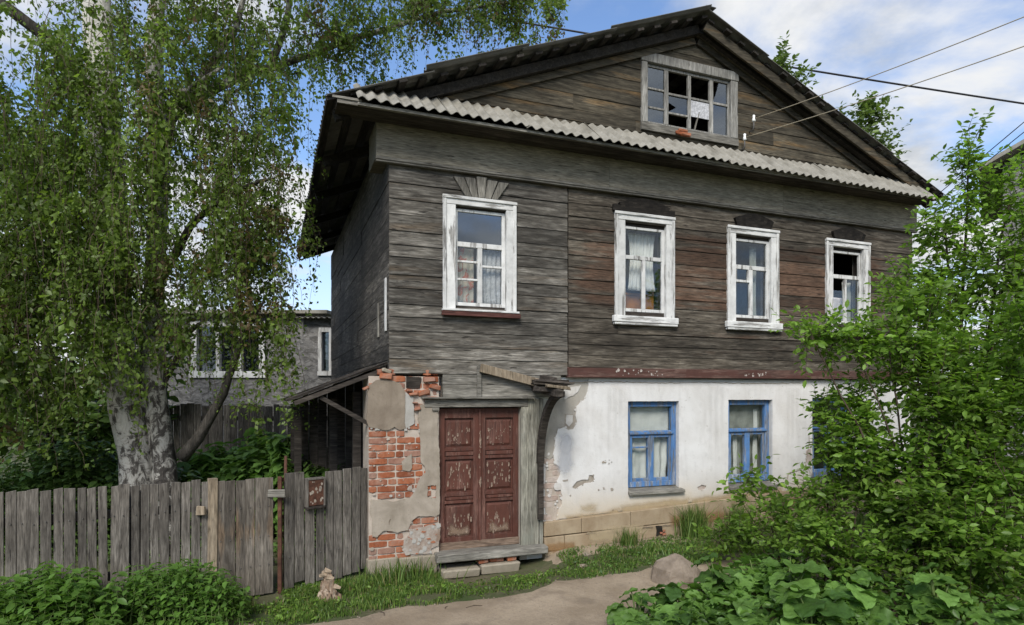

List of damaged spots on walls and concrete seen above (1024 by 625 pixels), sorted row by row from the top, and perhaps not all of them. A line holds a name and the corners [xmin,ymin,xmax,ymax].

spalling [362,368,441,411]
peeling [367,424,511,499]
spalling [543,381,614,521]
peeling [369,513,472,559]
peeling [487,511,510,534]